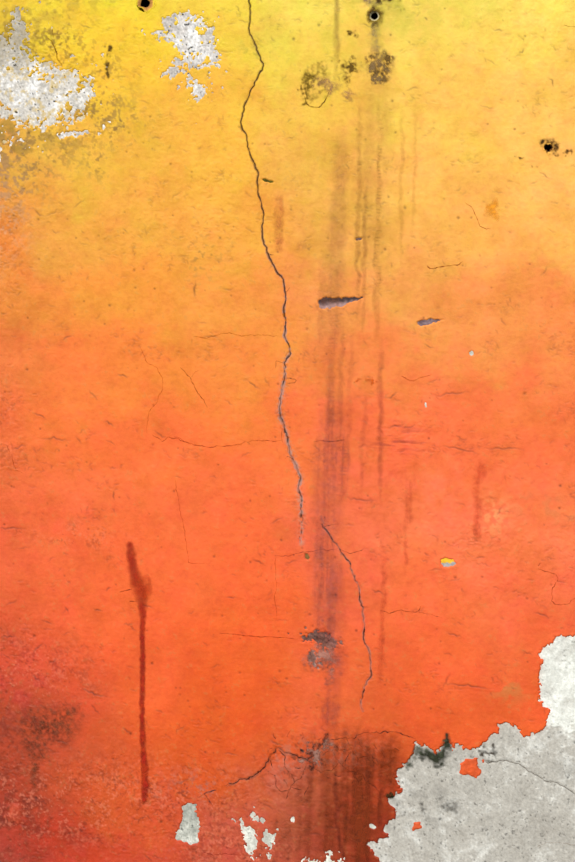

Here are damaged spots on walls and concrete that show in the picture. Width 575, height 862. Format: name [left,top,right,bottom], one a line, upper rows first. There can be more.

peeling [0,6,111,162]
peeling [141,10,228,103]
water stain [300,73,333,105]
water stain [369,52,394,84]
spalling [318,297,363,309]
crack [140,0,442,806]
rust [127,543,149,802]
spalling [300,627,343,669]
peeling [367,635,575,862]
crack [481,759,575,795]
peeling [175,803,200,845]
peeling [231,806,279,860]